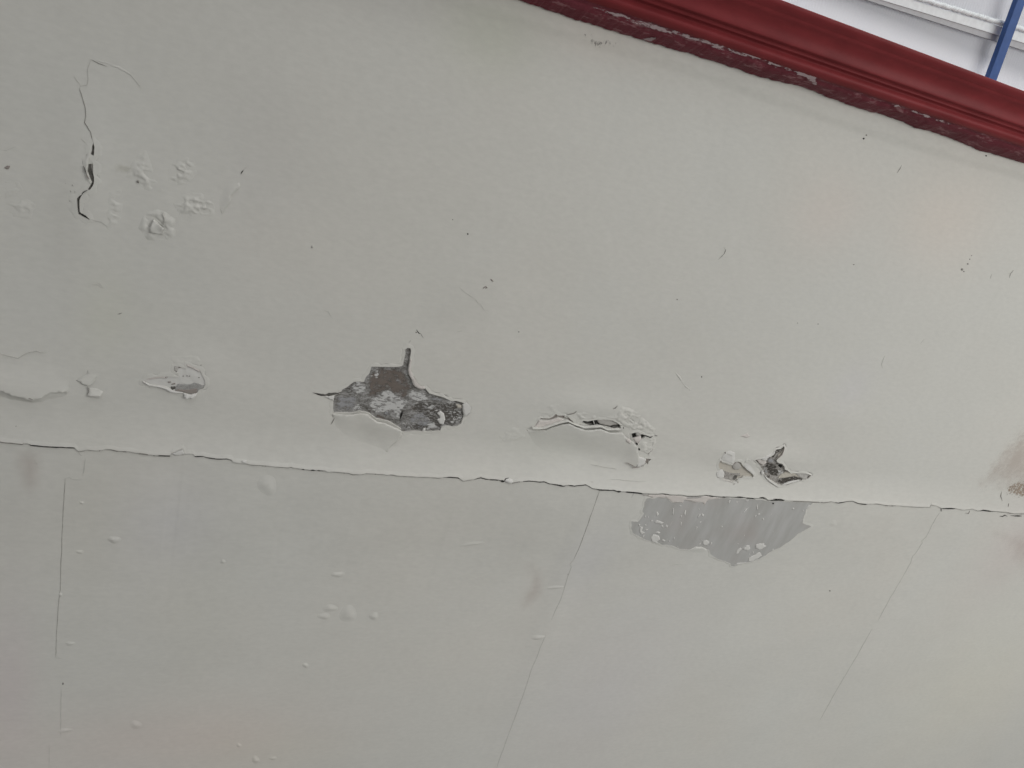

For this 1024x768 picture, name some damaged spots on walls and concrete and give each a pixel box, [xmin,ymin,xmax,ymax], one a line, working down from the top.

crack [65,60,140,228]
flaking render [139,355,210,399]
flaking render [315,343,472,452]
flaking render [499,404,656,469]
flaking render [716,444,812,488]
peeling [629,494,814,568]
crack [0,437,1024,766]